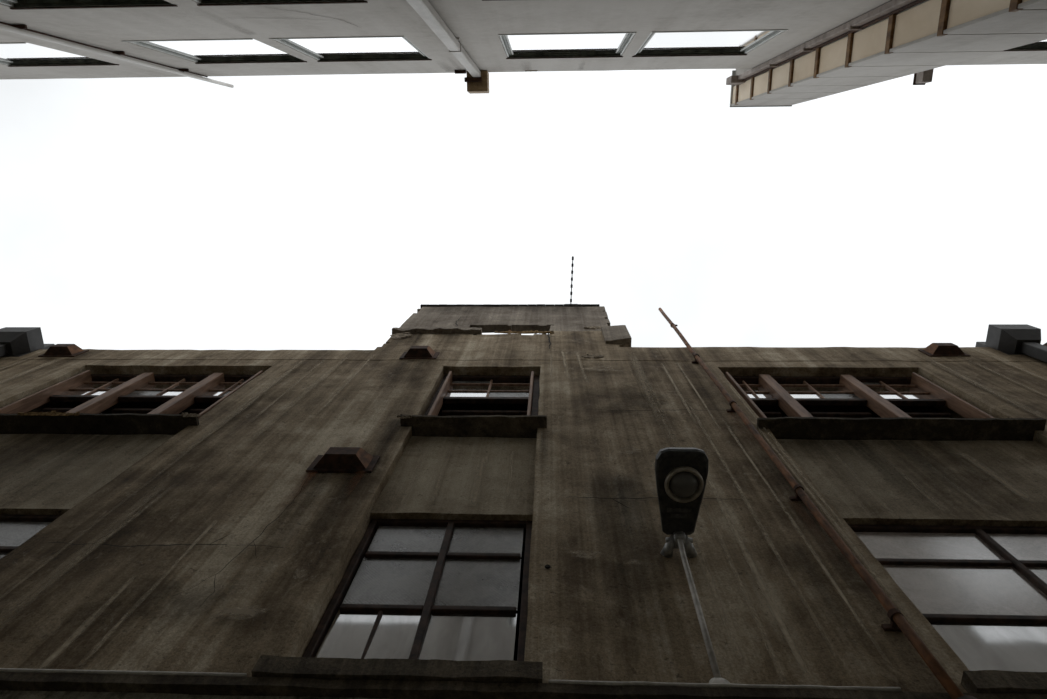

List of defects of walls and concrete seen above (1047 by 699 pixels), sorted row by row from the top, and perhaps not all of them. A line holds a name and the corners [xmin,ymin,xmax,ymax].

crack [48,484,304,603]